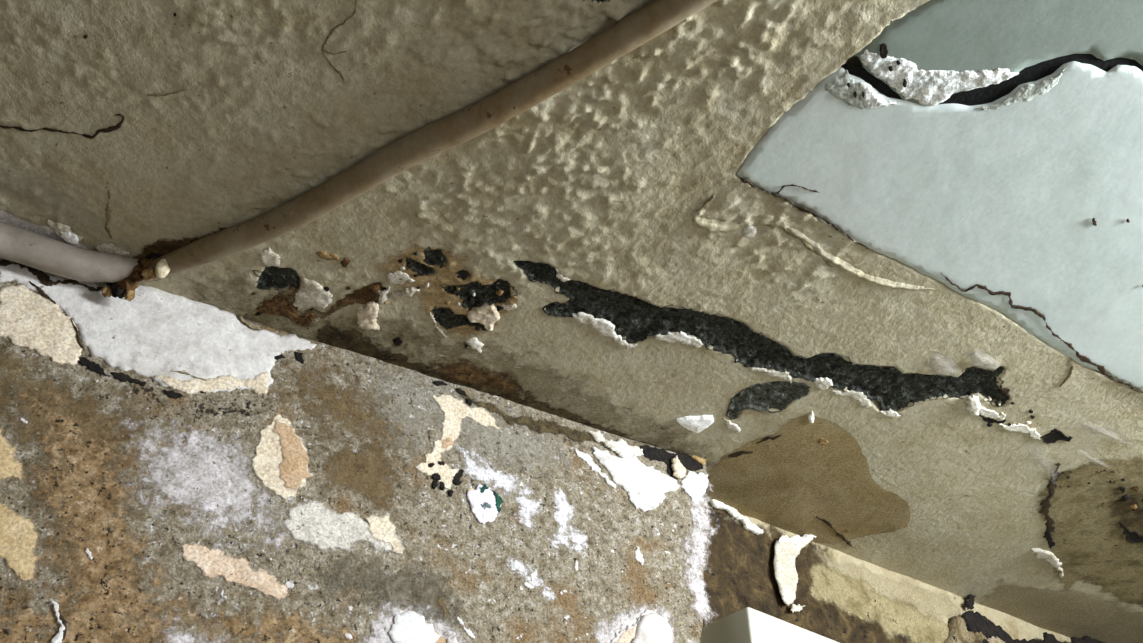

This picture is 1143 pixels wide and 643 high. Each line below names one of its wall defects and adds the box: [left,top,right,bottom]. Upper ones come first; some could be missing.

crack [0,114,125,139]
crack [147,88,188,97]
crack [321,0,357,82]
peeling [0,258,317,399]
flaking render [513,261,1073,444]
crack [941,273,1143,393]
peeling [575,430,763,535]
peeling [773,534,816,613]
water stain [685,415,949,643]
peeling [979,457,1143,643]
water stain [1062,561,1143,604]
water stain [1108,494,1143,545]